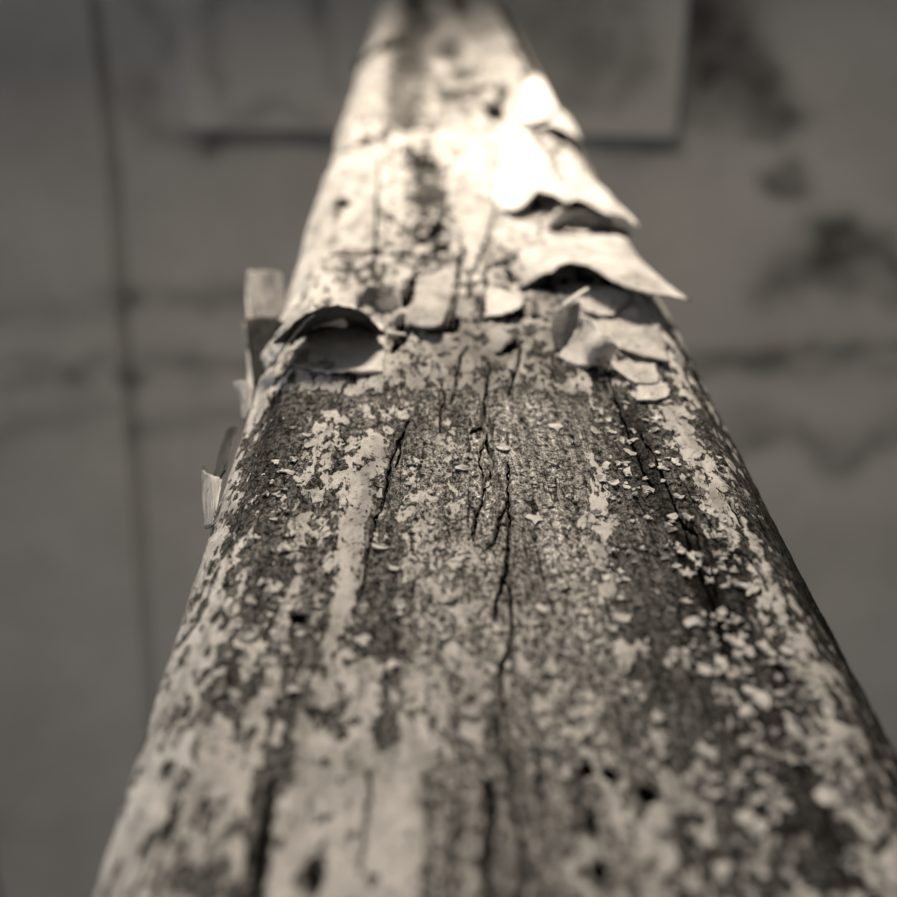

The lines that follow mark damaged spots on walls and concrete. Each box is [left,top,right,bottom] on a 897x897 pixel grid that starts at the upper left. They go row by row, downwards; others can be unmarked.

crack [352,38,408,71]
crack [442,83,507,120]
water stain [688,0,795,123]
peeling [484,76,759,600]
peeling [201,268,457,529]
peeling [261,456,307,553]
crack [330,118,728,897]
crack [728,503,768,592]
peeling [221,623,284,673]
peeling [579,599,632,651]
peeling [664,606,859,897]
crack [151,793,174,877]